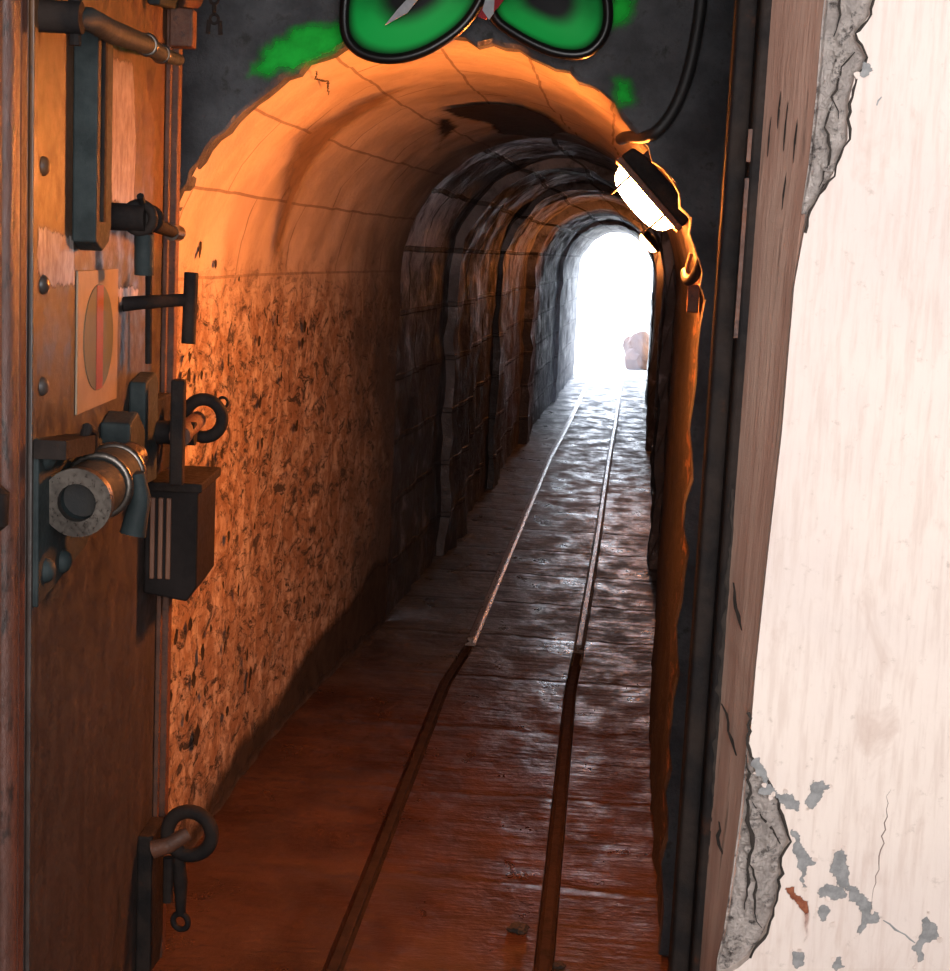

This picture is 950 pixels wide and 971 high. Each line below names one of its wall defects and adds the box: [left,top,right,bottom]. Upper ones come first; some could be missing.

spalling [801,0,875,233]
spalling [716,712,880,971]
peeling [912,911,943,969]